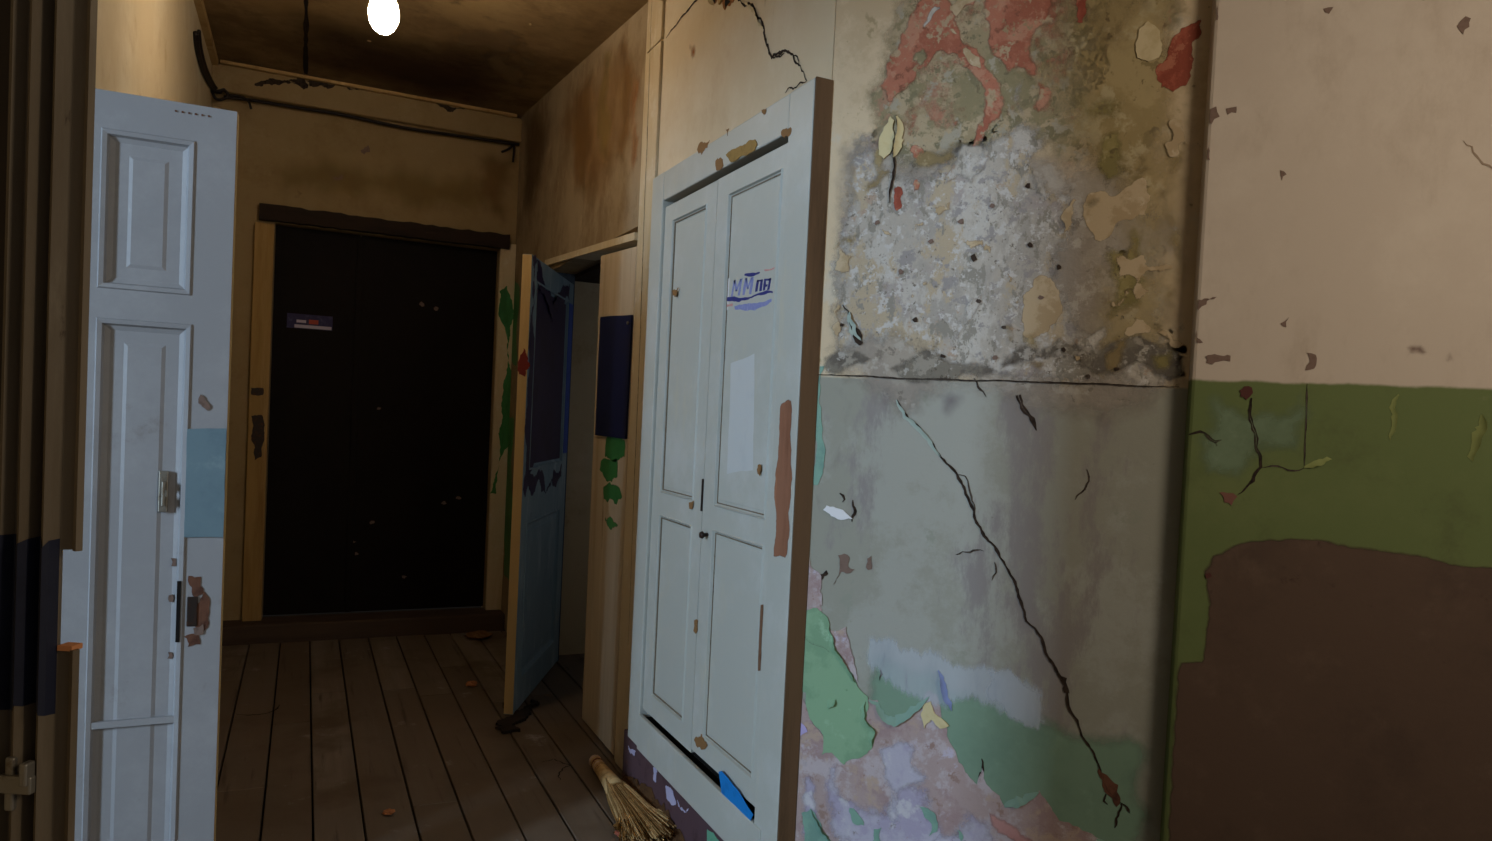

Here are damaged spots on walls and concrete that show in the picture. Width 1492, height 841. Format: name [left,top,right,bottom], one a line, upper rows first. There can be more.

crack [738,0,807,93]
peeling [832,0,1231,414]
spalling [1210,107,1237,124]
crack [1189,391,1331,494]
peeling [795,554,1145,841]
crack [818,374,1177,828]
peeling [1168,539,1492,841]